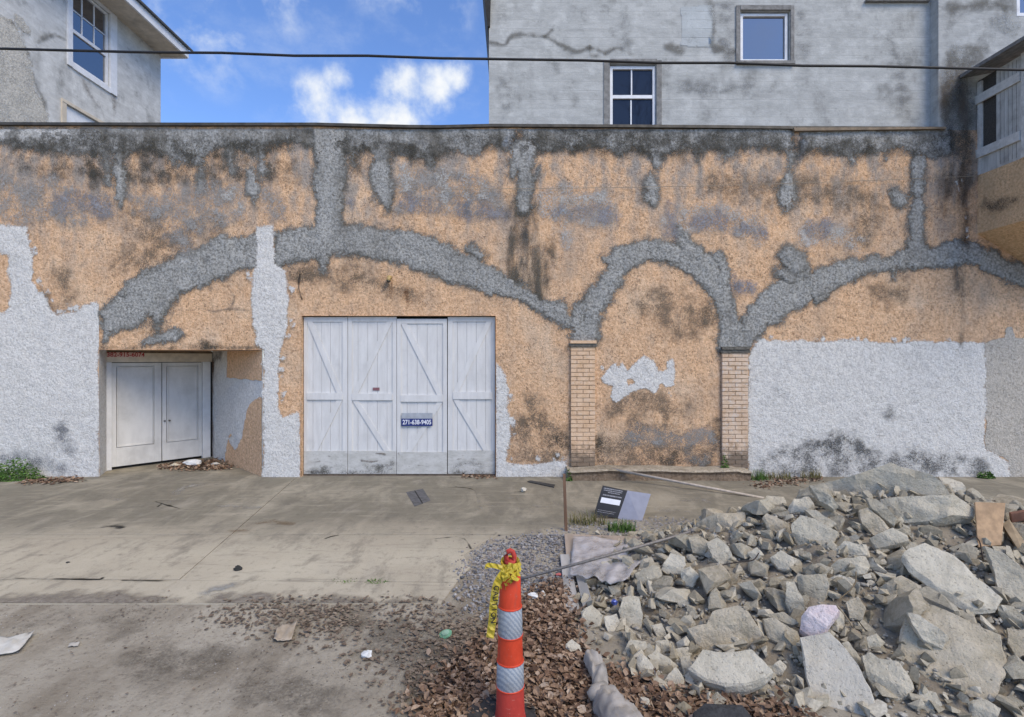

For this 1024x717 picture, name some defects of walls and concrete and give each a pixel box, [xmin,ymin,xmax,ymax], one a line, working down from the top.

crack [557,43,611,53]
damp [7,131,299,189]
damp [335,47,982,246]
peeling [0,15,1024,477]
damp [510,204,574,300]
damp [759,434,988,477]